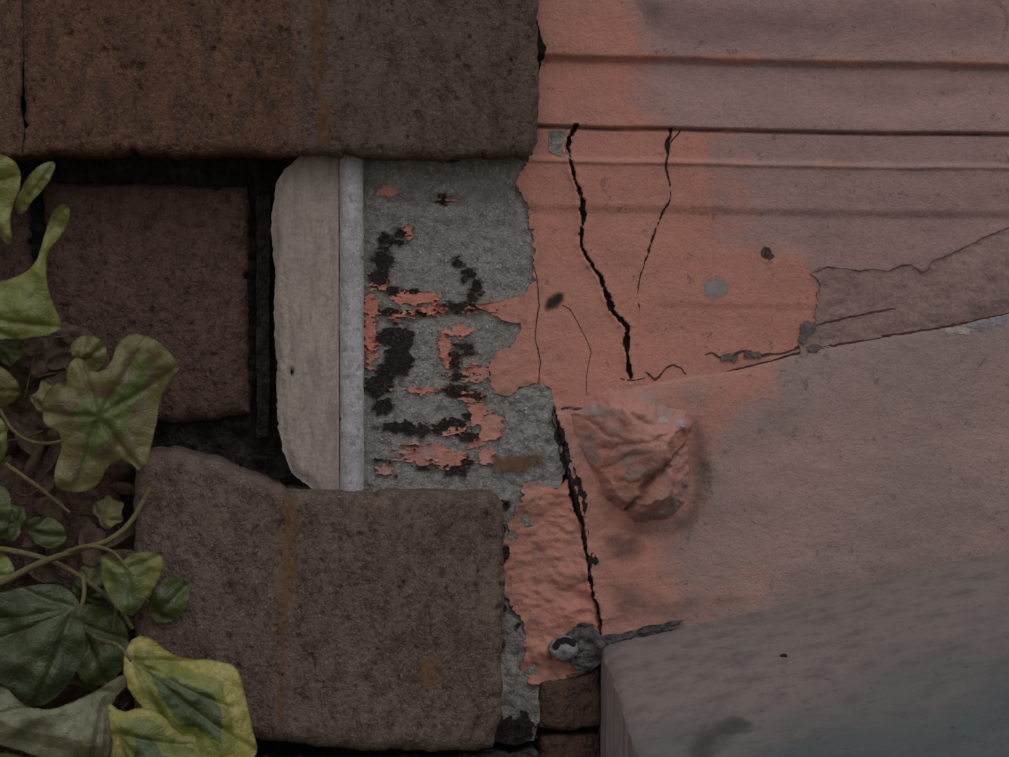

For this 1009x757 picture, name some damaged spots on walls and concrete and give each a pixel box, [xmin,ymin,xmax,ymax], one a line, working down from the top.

spalling [434,192,460,206]
spalling [363,225,566,488]
crack [531,262,602,635]
crack [566,123,681,381]
spalling [705,227,1009,362]
spalling [495,710,538,745]